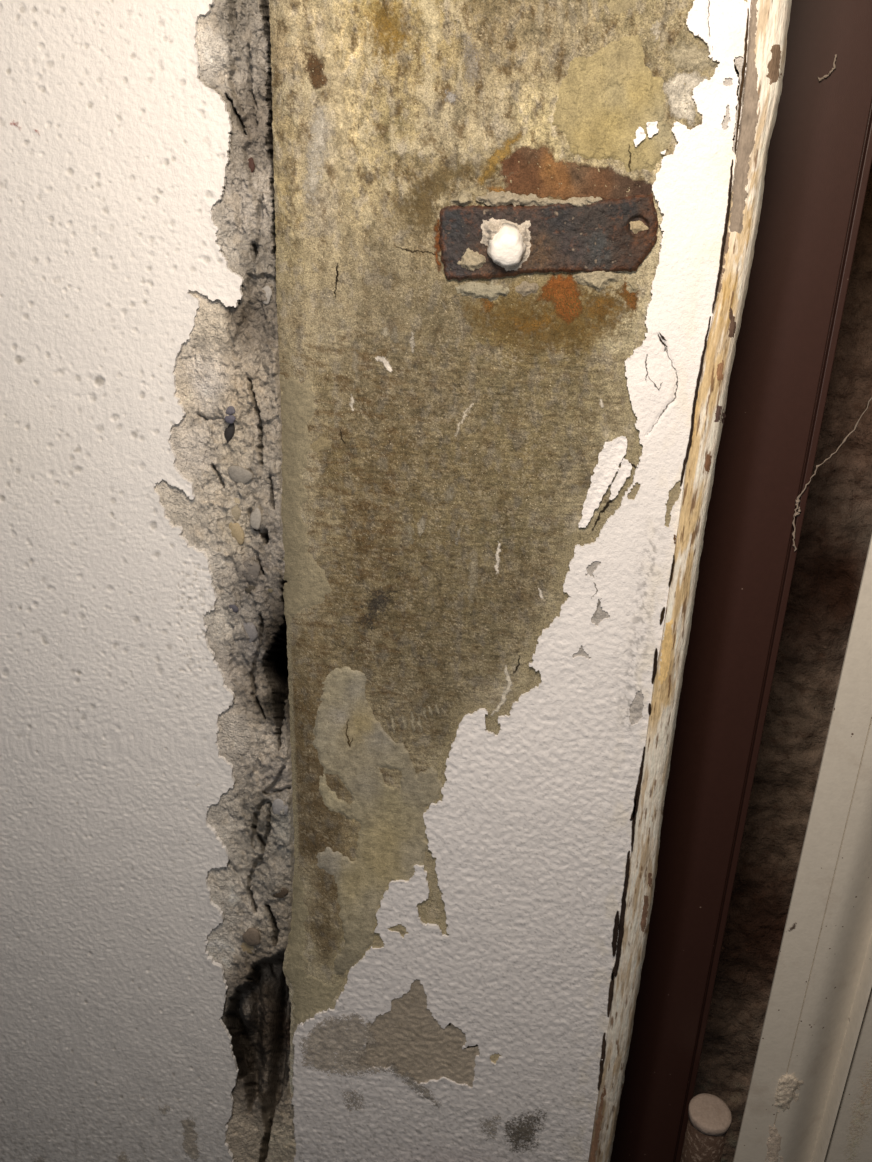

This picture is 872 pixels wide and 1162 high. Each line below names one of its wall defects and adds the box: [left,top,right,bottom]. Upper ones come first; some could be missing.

water stain [418,0,442,42]
crack [226,0,276,280]
water stain [305,3,349,202]
corrosion [479,134,653,200]
water stain [664,42,712,124]
corrosion [465,275,638,352]
crack [213,464,225,487]
crack [247,378,275,575]
peeling [155,0,782,1162]
crack [249,615,266,719]
crack [246,766,291,945]
crack [259,1104,278,1162]